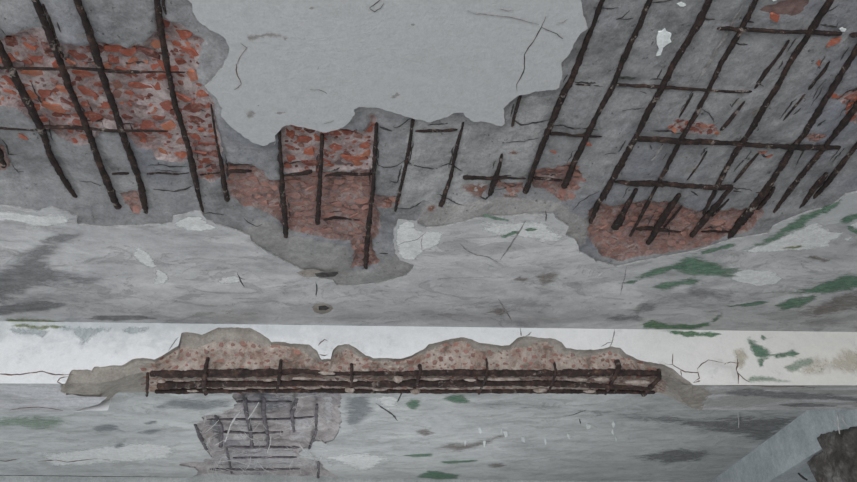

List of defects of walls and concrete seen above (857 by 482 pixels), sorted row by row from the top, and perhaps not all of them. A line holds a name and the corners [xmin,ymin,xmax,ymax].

crack [469,9,566,87]
spalling [0,0,857,286]
leakage [624,263,718,297]
leakage [729,294,857,315]
crack [669,354,815,388]
leakage [775,350,812,370]
spalling [45,327,712,477]